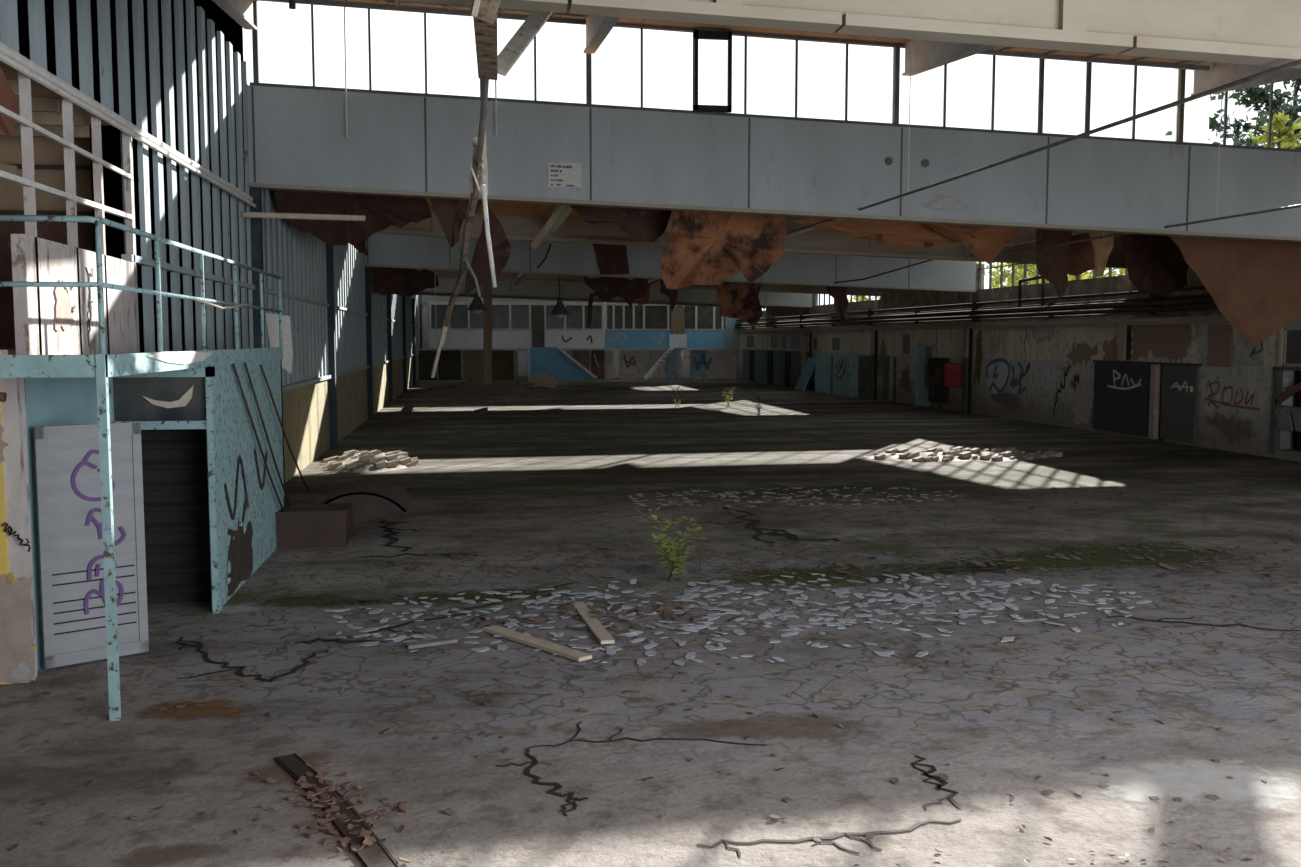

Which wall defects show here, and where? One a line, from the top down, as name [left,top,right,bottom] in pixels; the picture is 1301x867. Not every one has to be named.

crack [495,721,767,816]